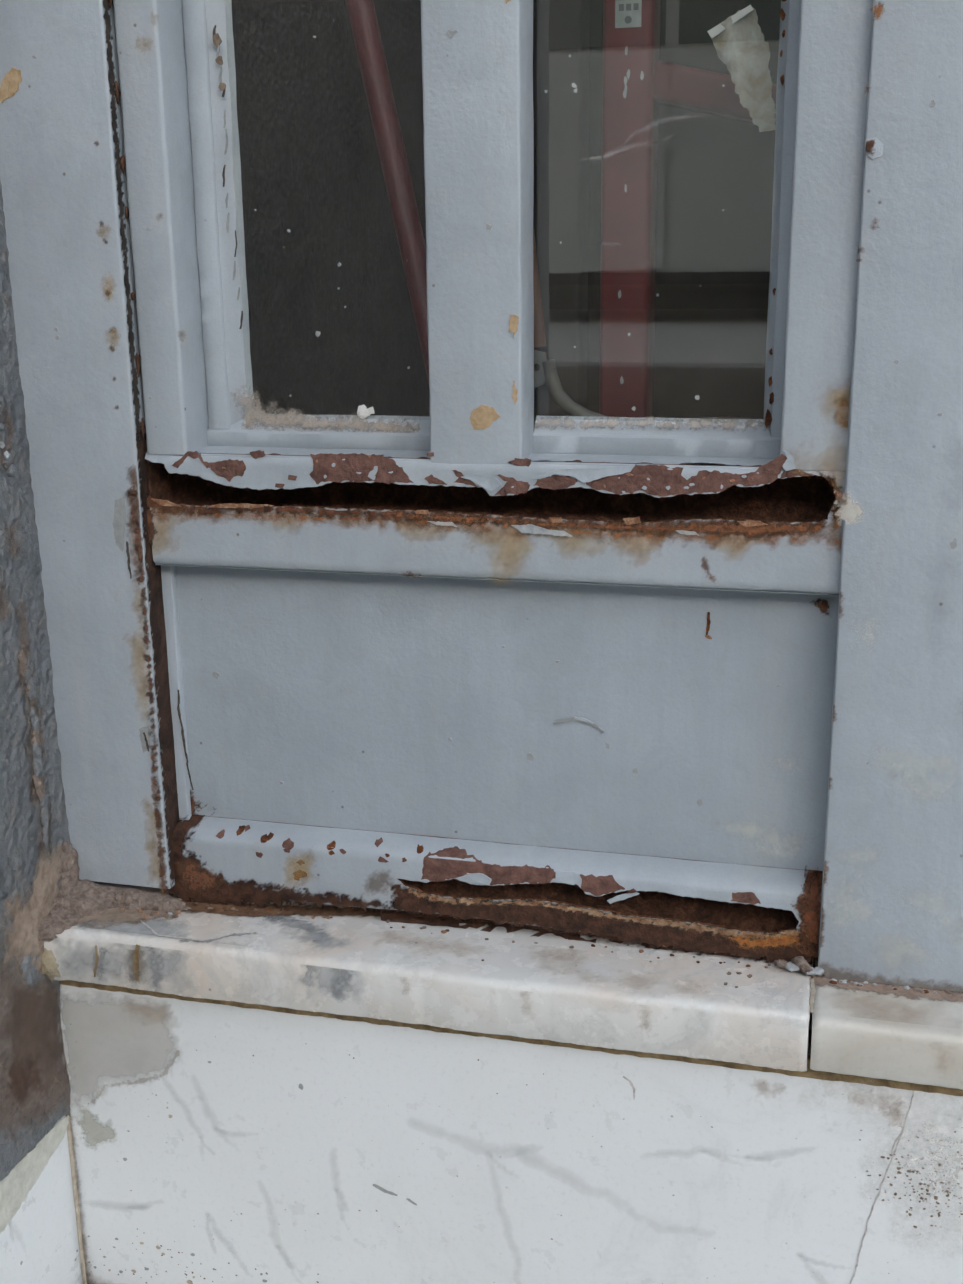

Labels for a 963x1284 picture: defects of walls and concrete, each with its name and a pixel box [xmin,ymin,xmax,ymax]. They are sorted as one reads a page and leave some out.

peeling [0,68,22,103]
peeling [508,315,519,338]
peeling [470,404,501,430]
spalling [146,450,837,537]
corrosion [113,432,863,977]
peeling [216,825,307,881]
peeling [327,841,346,855]
crack [850,1091,914,1284]